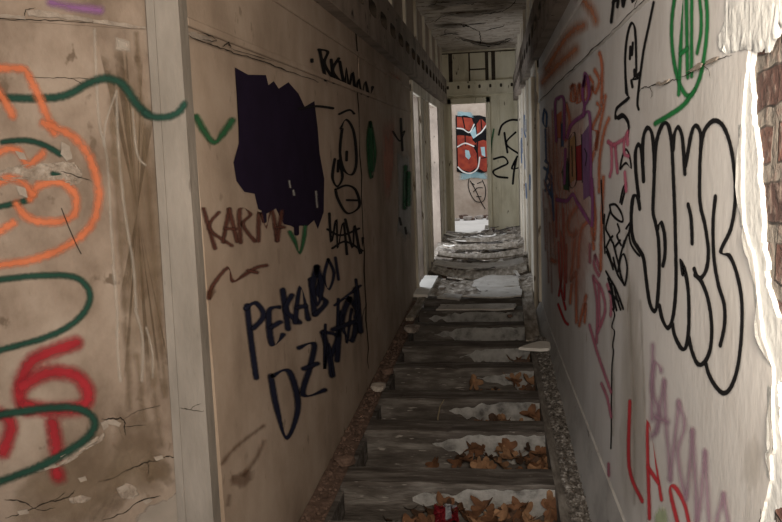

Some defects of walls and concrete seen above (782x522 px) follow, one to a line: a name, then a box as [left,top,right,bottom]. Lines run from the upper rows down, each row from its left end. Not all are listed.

flaking render [717,0,782,54]
crack [638,56,726,97]
flaking render [0,142,92,198]
peeling [735,125,771,367]
crack [104,405,160,435]
crack [99,456,174,482]
crack [8,490,75,518]
crack [104,496,158,520]